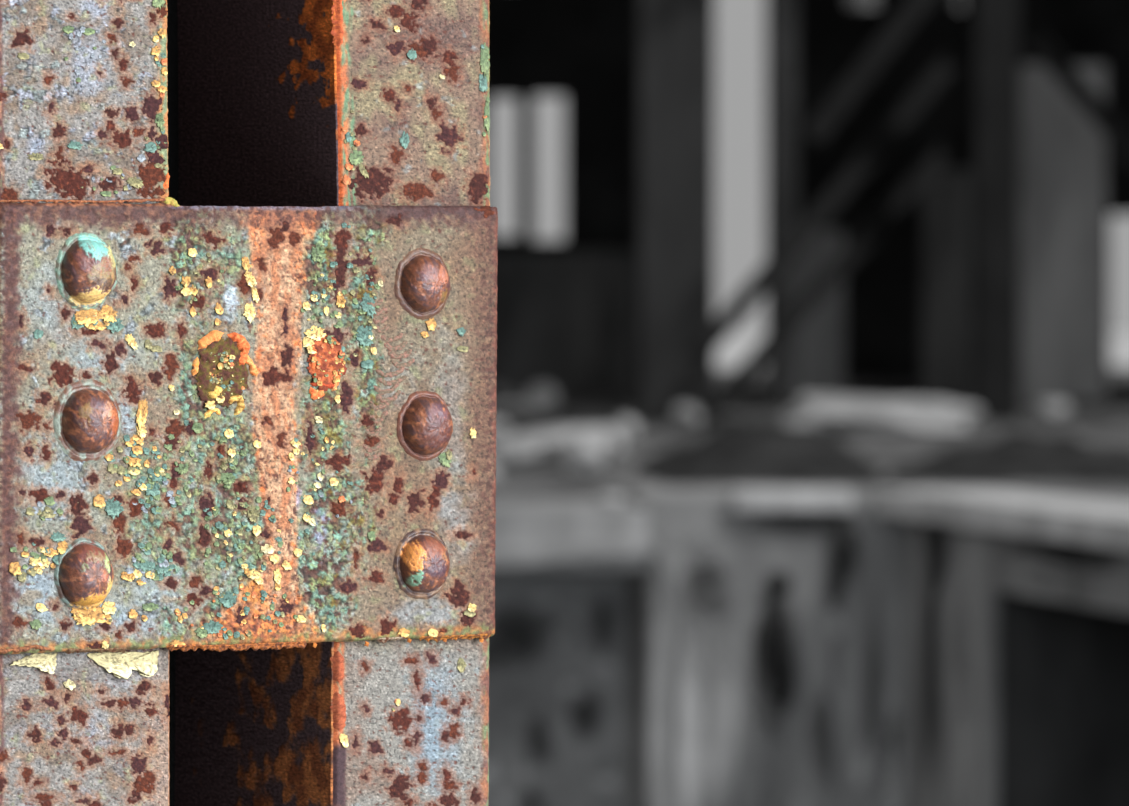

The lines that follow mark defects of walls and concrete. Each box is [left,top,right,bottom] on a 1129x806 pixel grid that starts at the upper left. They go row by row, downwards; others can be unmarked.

rust [0,133,180,207]
rust [348,167,434,203]
peeling [168,248,224,326]
rust [16,361,74,431]
peeling [71,304,162,352]
rust [263,344,294,387]
spalling [301,238,415,460]
peeling [93,399,353,640]
peeling [11,652,76,691]
peeling [87,640,186,679]
rust [166,641,317,652]
rust [349,579,491,647]